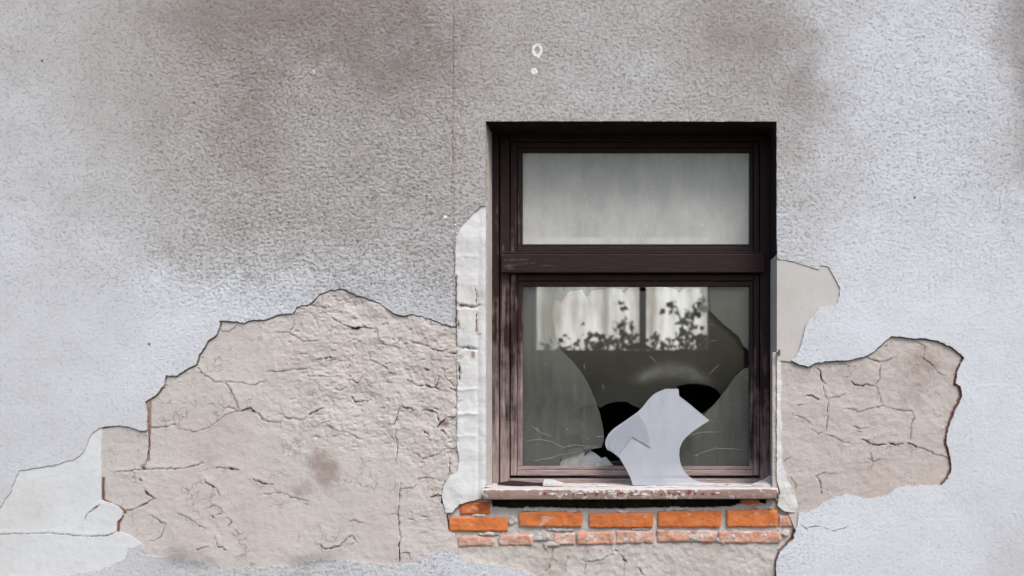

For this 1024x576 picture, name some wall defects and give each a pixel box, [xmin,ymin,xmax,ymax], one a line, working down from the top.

crack [117,248,479,562]
spalling [0,201,961,576]
crack [798,357,947,468]